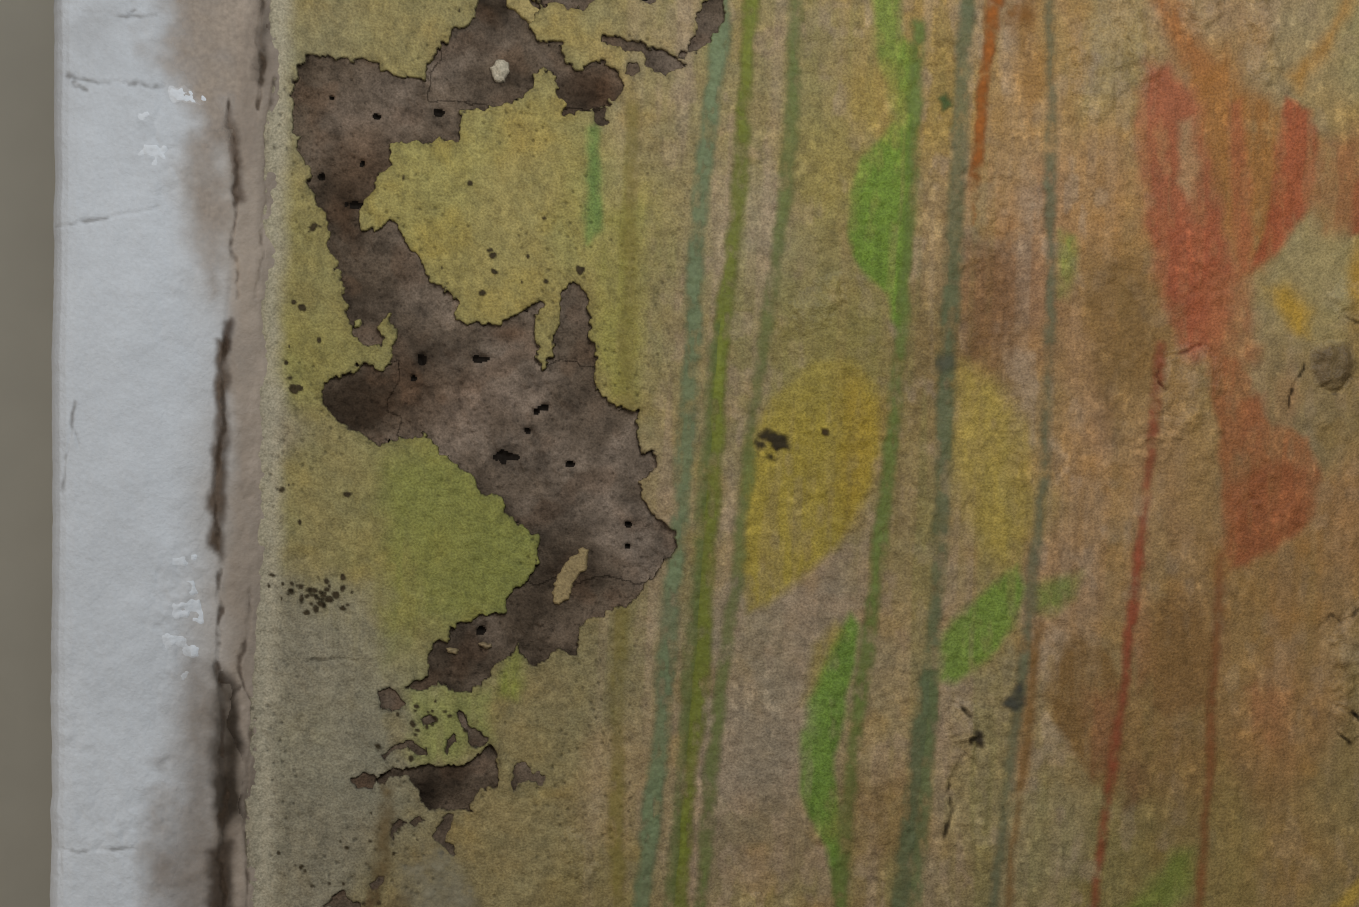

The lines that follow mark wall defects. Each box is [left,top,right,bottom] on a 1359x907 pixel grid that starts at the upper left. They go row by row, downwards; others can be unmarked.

crack [256,54,266,109]
peeling [284,345,303,394]
crack [217,399,226,464]
spalling [291,0,724,858]
peeling [268,573,353,615]